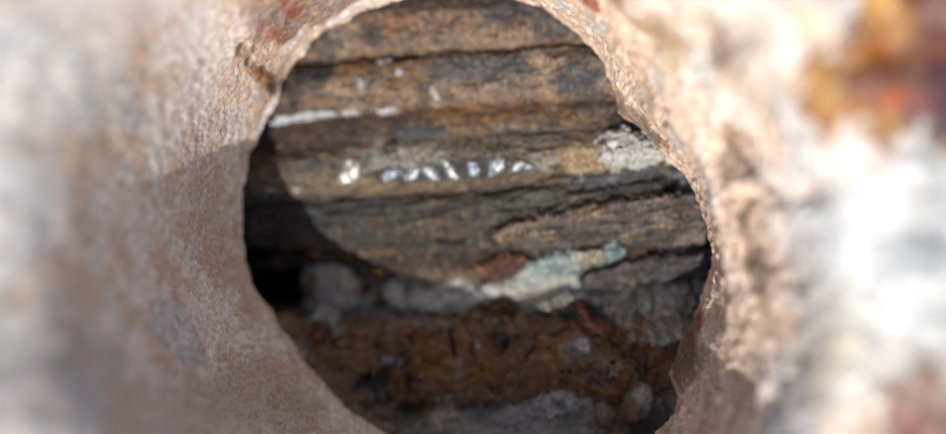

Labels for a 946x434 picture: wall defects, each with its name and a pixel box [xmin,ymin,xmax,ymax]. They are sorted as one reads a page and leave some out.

leakage [510,239,628,287]
rust [553,325,648,379]